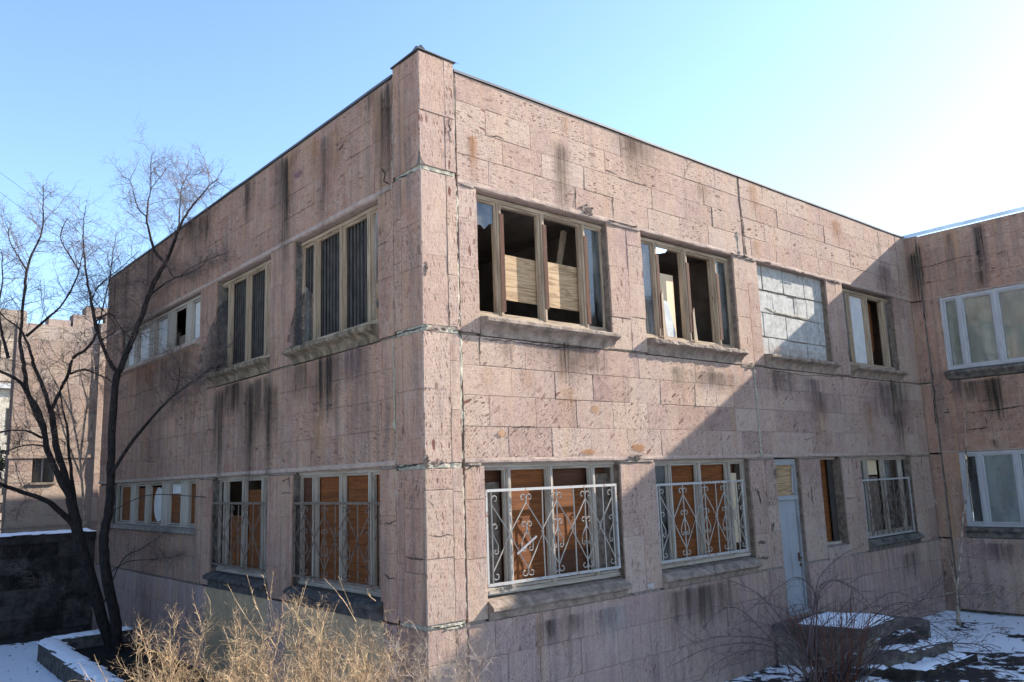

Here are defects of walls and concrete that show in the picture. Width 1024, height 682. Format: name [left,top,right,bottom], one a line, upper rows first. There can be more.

crack [383,534,465,579]